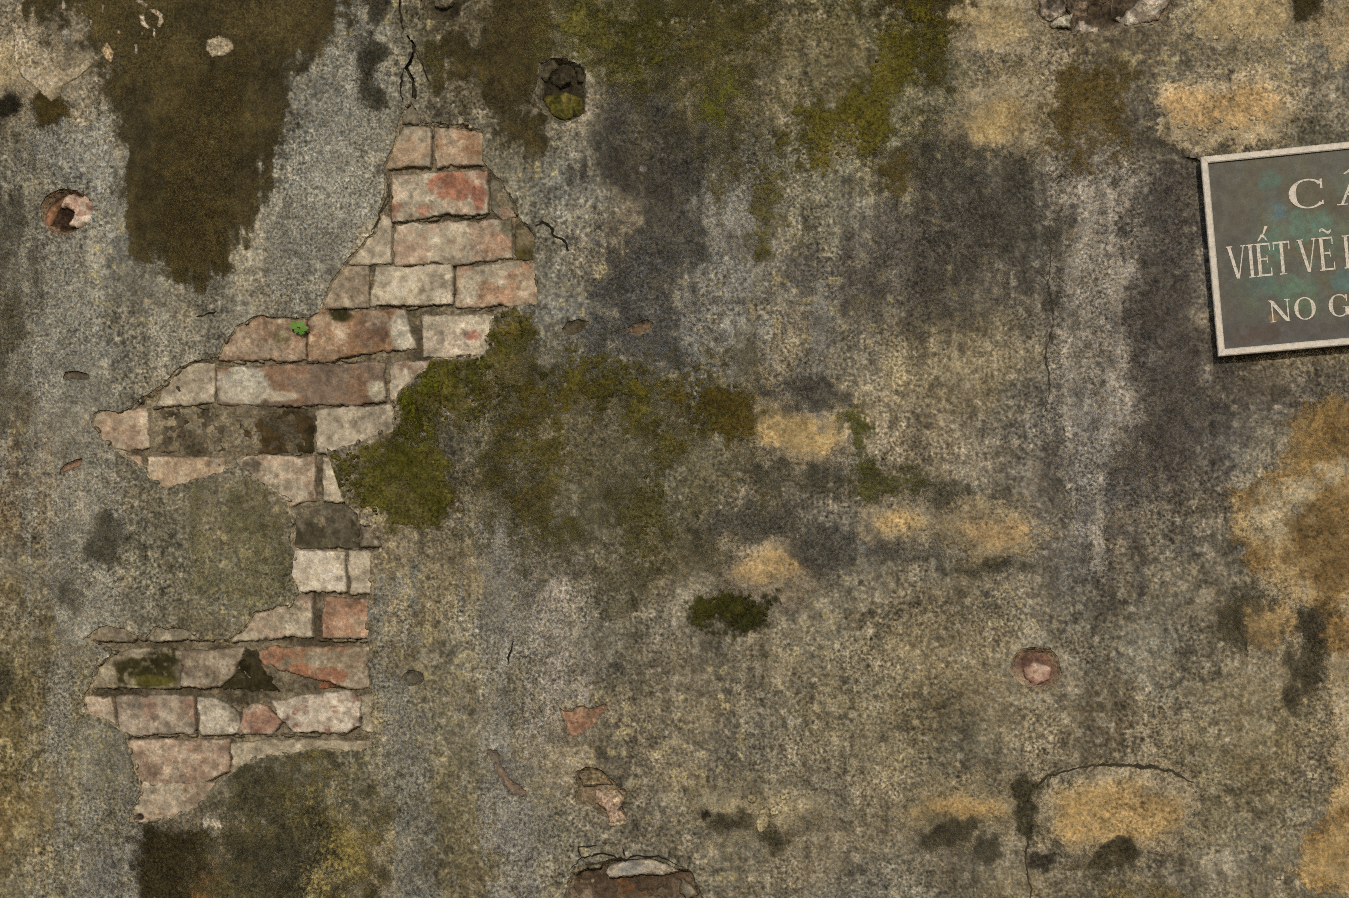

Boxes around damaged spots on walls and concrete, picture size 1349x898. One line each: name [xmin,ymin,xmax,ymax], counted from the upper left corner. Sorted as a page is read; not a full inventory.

crack [398,0,430,102]
spalling [420,0,474,22]
spalling [1031,0,1175,38]
damp [1293,0,1349,67]
spalling [532,57,586,125]
damp [13,0,397,316]
spalling [41,188,92,236]
flaking render [82,98,538,838]
spalling [1008,647,1062,689]
damp [1217,394,1349,897]
spalling [564,857,703,898]